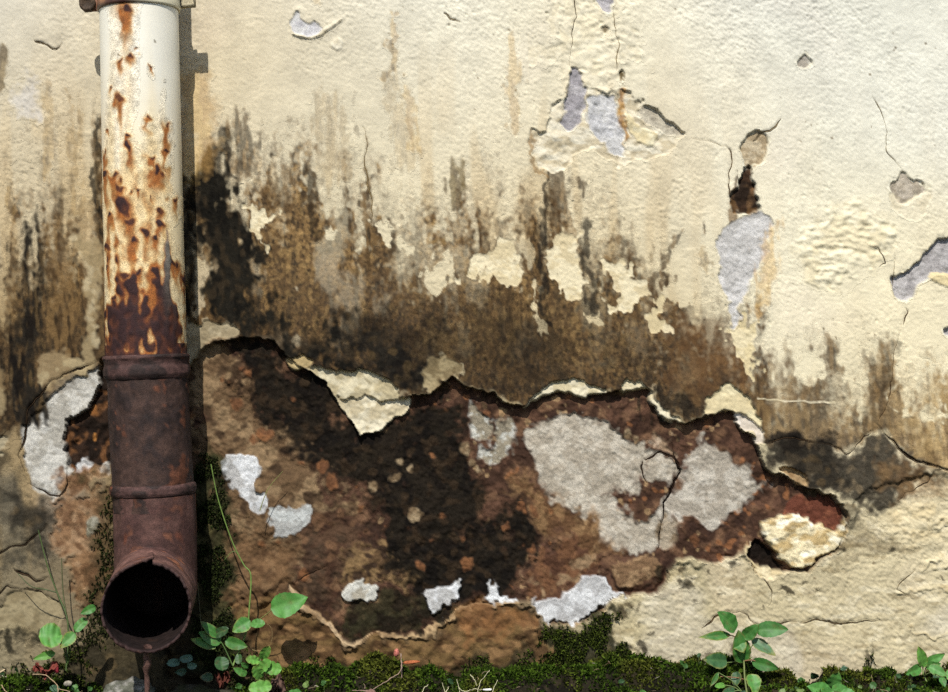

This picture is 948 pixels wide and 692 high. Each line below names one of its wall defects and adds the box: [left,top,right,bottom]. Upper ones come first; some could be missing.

damp [0,40,13,111]
crack [1,360,99,496]
damp [0,70,107,604]
corrosion [99,2,187,356]
spalling [186,314,841,670]
damp [180,9,948,576]
peeling [543,226,591,303]
peeling [527,0,687,180]
crack [640,444,681,549]
peeling [714,126,786,382]
crack [765,310,948,499]
damp [0,623,282,692]